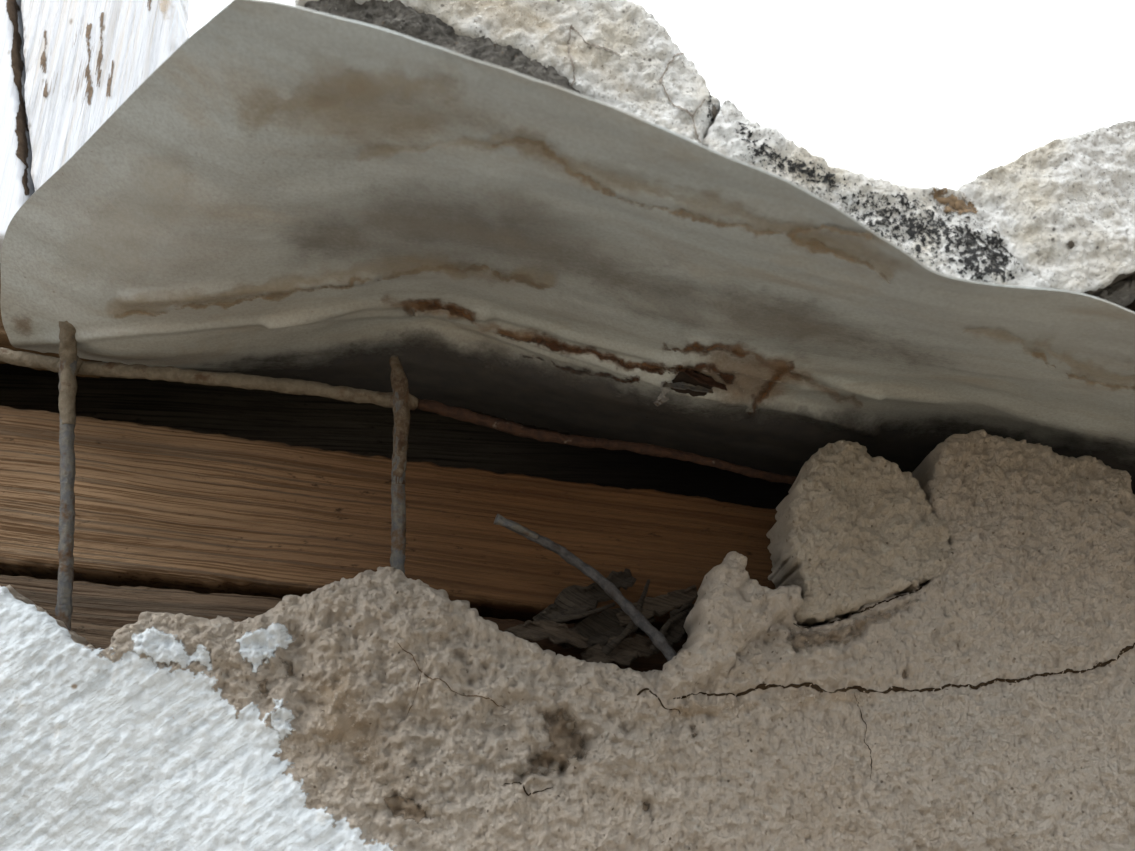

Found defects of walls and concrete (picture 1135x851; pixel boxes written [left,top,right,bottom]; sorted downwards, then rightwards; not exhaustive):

crack [567,25,620,87]
crack [659,52,706,143]
damp [661,208,889,283]
corrosion [58,321,78,425]
corrosion [389,356,410,485]
corrosion [748,362,794,414]
crack [793,580,929,628]
peeling [0,586,397,851]
crack [637,643,1135,782]
flaking render [384,795,426,823]